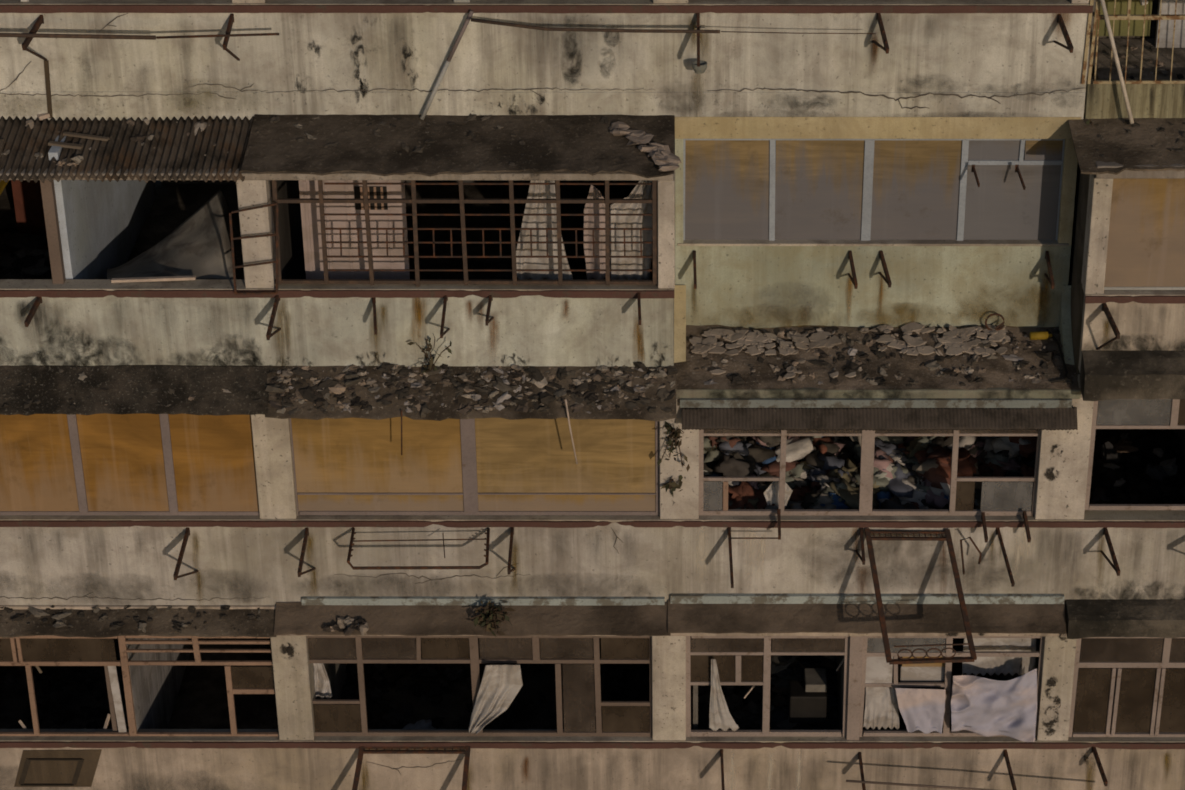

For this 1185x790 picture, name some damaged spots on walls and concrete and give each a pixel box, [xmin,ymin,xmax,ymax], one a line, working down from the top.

leakage [352,35,367,96]
crack [715,88,1083,109]
leakage [17,304,127,366]
leakage [228,342,258,367]